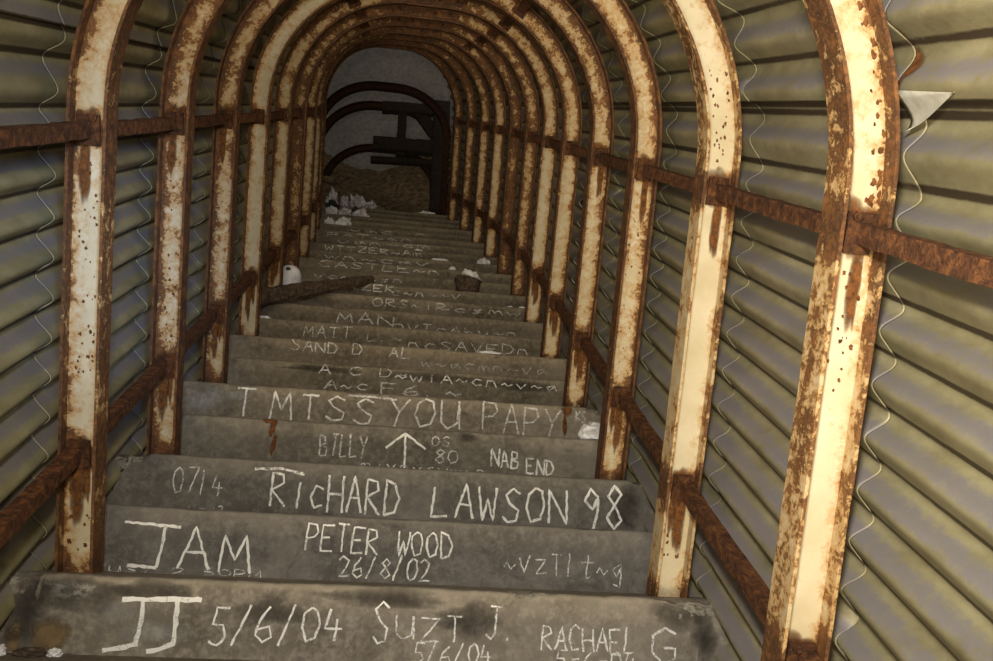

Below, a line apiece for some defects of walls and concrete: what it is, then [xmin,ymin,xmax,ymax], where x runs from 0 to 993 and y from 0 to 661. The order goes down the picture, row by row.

corrosion [898,49,923,85]
corrosion [79,145,90,200]
corrosion [165,107,186,174]
corrosion [635,155,650,222]
corrosion [709,206,722,255]
corrosion [846,197,877,219]
corrosion [845,253,863,328]
peeling [75,324,95,373]
corrosion [609,384,623,450]
corrosion [66,436,93,523]
corrosion [668,469,689,550]
corrosion [786,632,815,649]